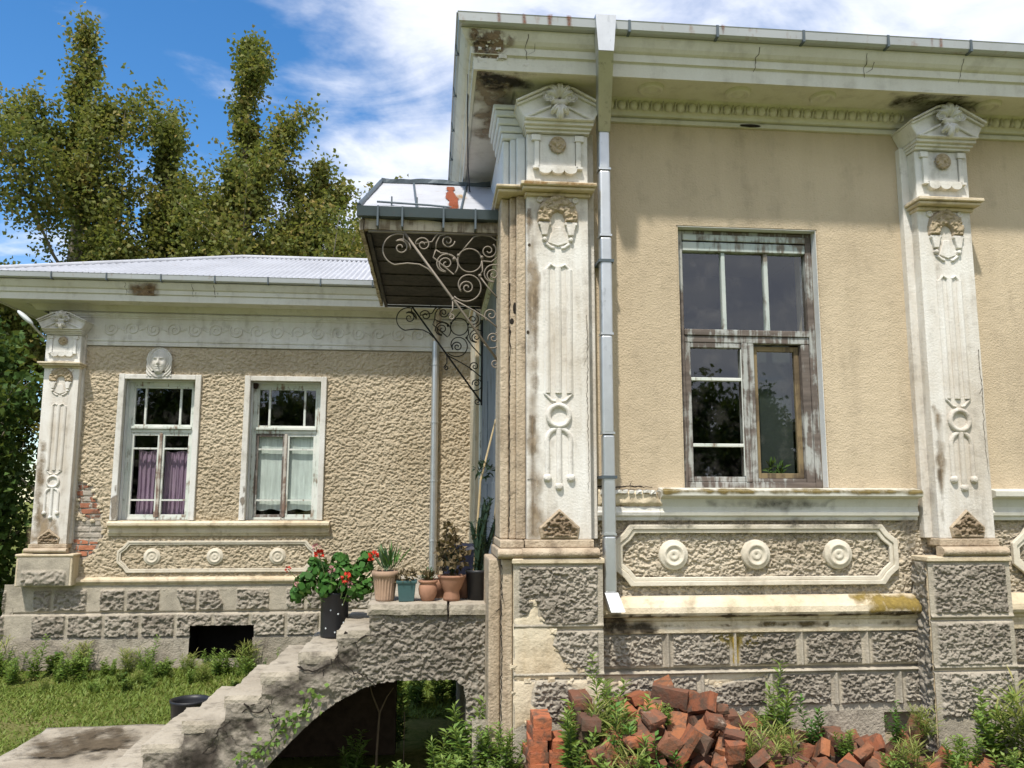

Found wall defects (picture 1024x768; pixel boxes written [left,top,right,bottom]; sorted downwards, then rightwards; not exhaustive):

peeling [470,27,529,74]
leakage [474,71,530,138]
leakage [892,94,972,108]
leakage [527,245,539,350]
leakage [529,416,537,455]
spalling [71,481,118,559]
leakage [530,474,542,537]